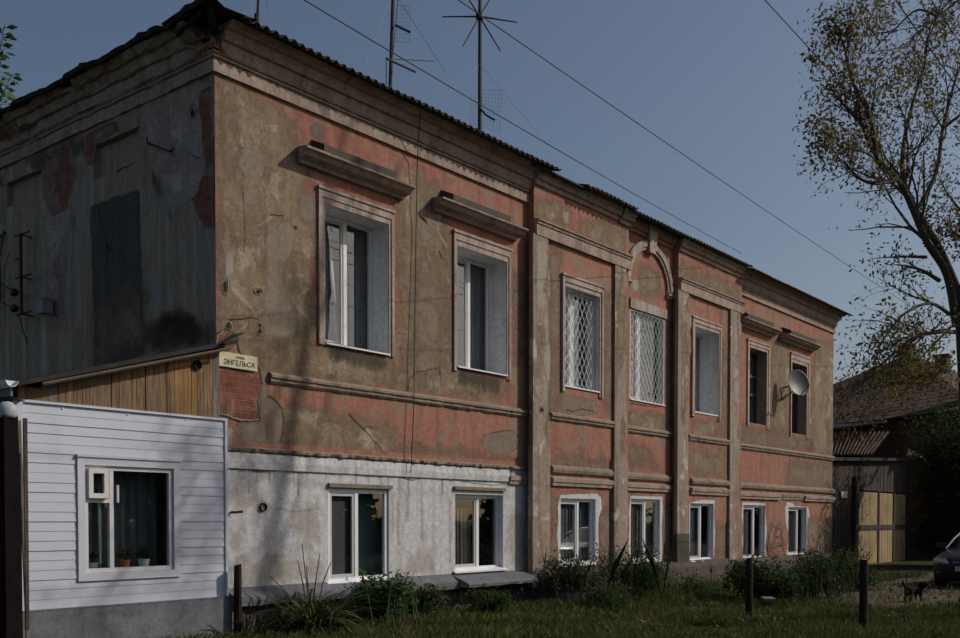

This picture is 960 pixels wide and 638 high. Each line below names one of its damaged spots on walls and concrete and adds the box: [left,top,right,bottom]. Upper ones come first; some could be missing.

spalling [42,146,78,216]
peeling [192,76,516,462]